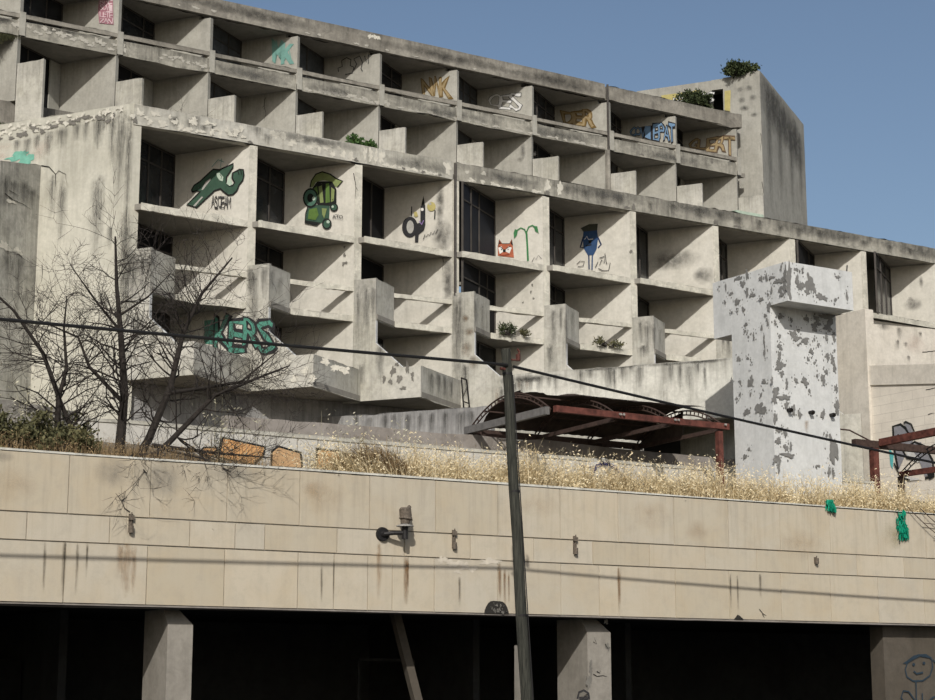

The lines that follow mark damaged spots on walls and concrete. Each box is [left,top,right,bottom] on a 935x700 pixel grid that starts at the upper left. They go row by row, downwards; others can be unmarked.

peeling [11,22,127,53]
peeling [0,106,253,144]
peeling [4,150,34,164]
peeling [382,362,414,390]
peeling [717,261,849,478]
peeling [437,556,501,574]